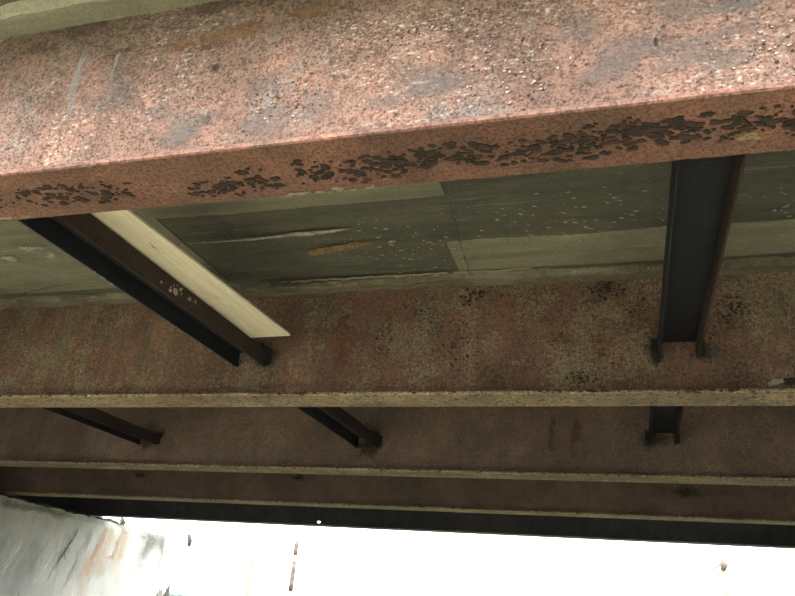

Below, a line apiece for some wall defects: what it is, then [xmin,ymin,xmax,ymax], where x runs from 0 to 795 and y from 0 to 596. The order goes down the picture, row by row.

damp [120,531,166,591]